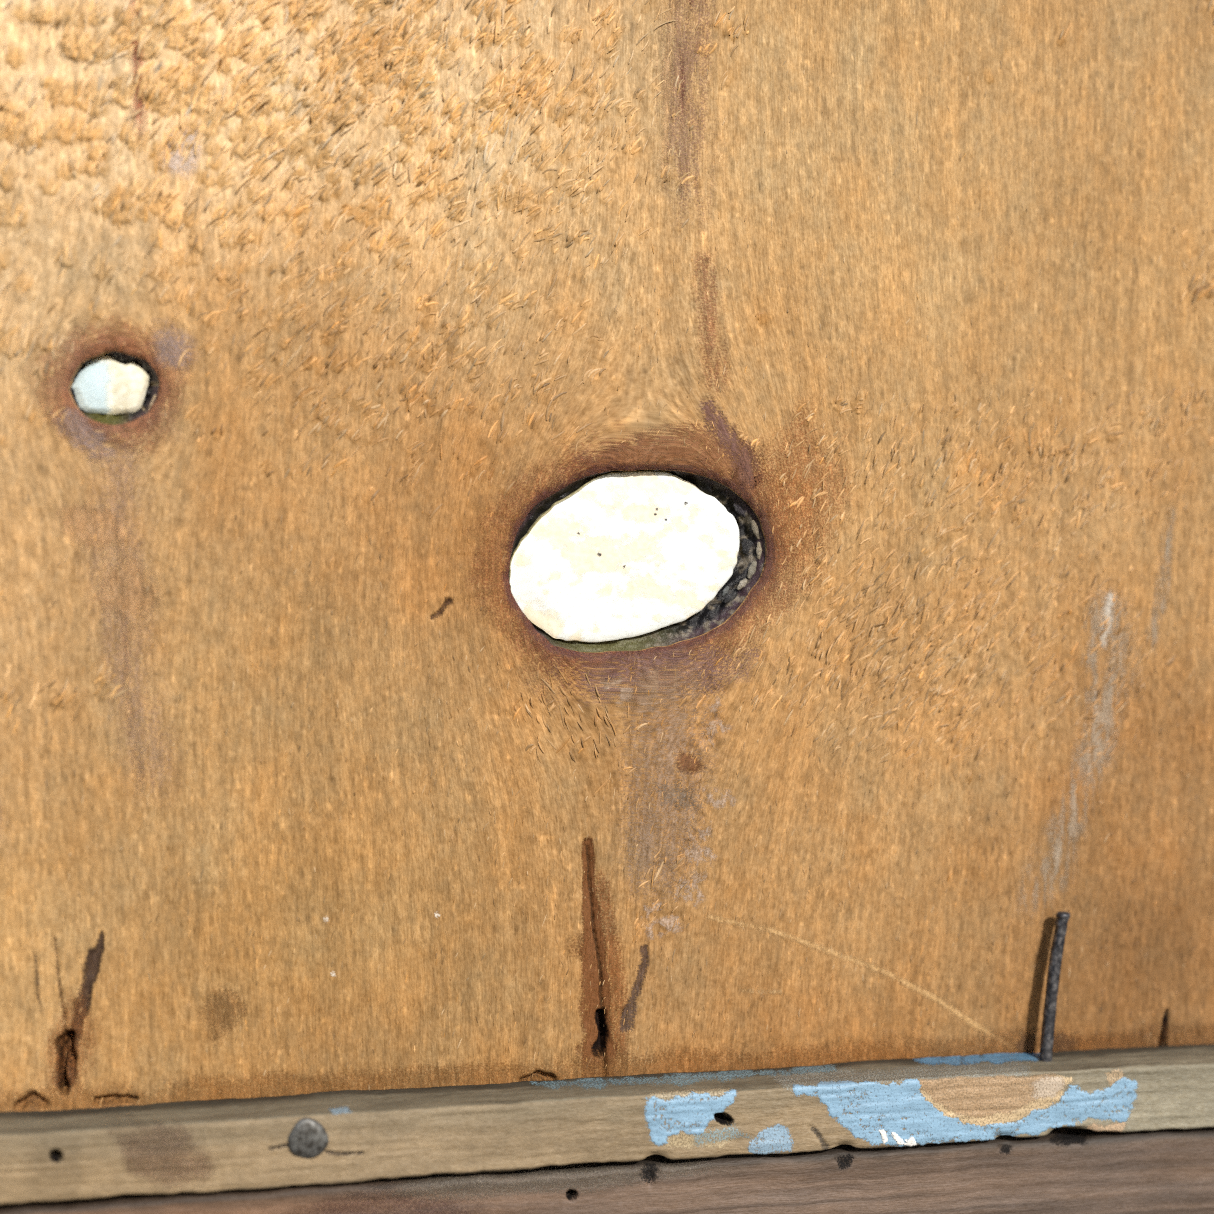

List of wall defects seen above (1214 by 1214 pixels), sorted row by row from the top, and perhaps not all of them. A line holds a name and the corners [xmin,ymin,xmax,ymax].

peeling [879,1130,917,1147]
peeling [1050,1132,1087,1145]